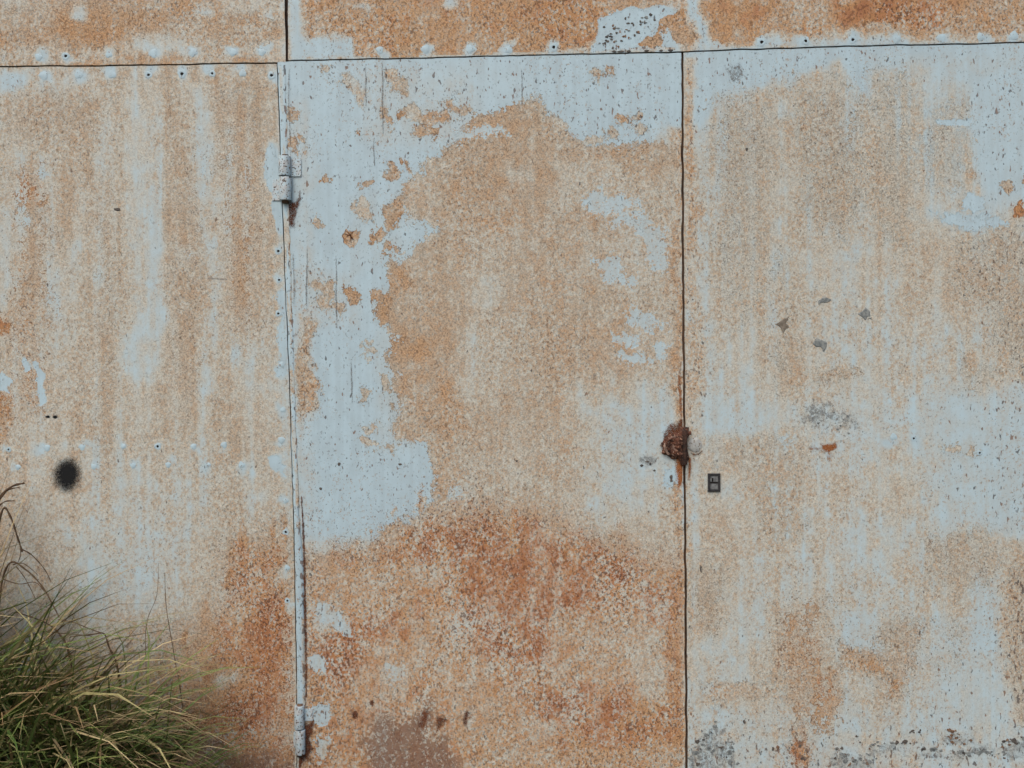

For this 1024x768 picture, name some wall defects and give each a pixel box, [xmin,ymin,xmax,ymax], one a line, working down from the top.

corrosion [301,0,1024,149]
corrosion [0,155,77,445]
corrosion [204,76,275,368]
corrosion [288,190,301,228]
peeling [305,91,682,638]
corrosion [660,362,683,450]
corrosion [945,173,1024,376]
corrosion [674,427,837,548]
peeling [307,651,336,675]
peeling [311,702,334,765]
corrosion [698,586,963,745]
corrosion [997,562,1024,731]